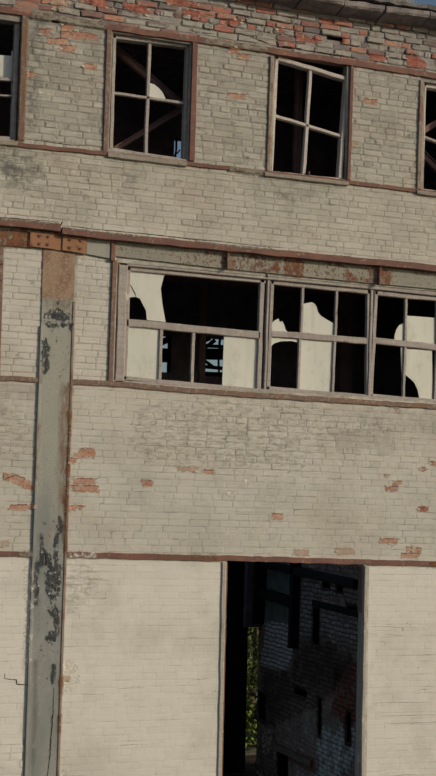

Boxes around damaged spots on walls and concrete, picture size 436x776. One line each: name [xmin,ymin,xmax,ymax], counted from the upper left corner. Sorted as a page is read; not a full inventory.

spalling [31,0,108,53]
corrosion [0,230,32,248]
peeling [41,301,74,388]
spalling [68,447,96,465]
spalling [3,473,35,490]
spalling [70,477,101,493]
spalling [384,474,402,492]
spalling [8,503,37,511]
spalling [379,538,422,559]
peeling [19,516,64,657]
crack [46,688,54,776]